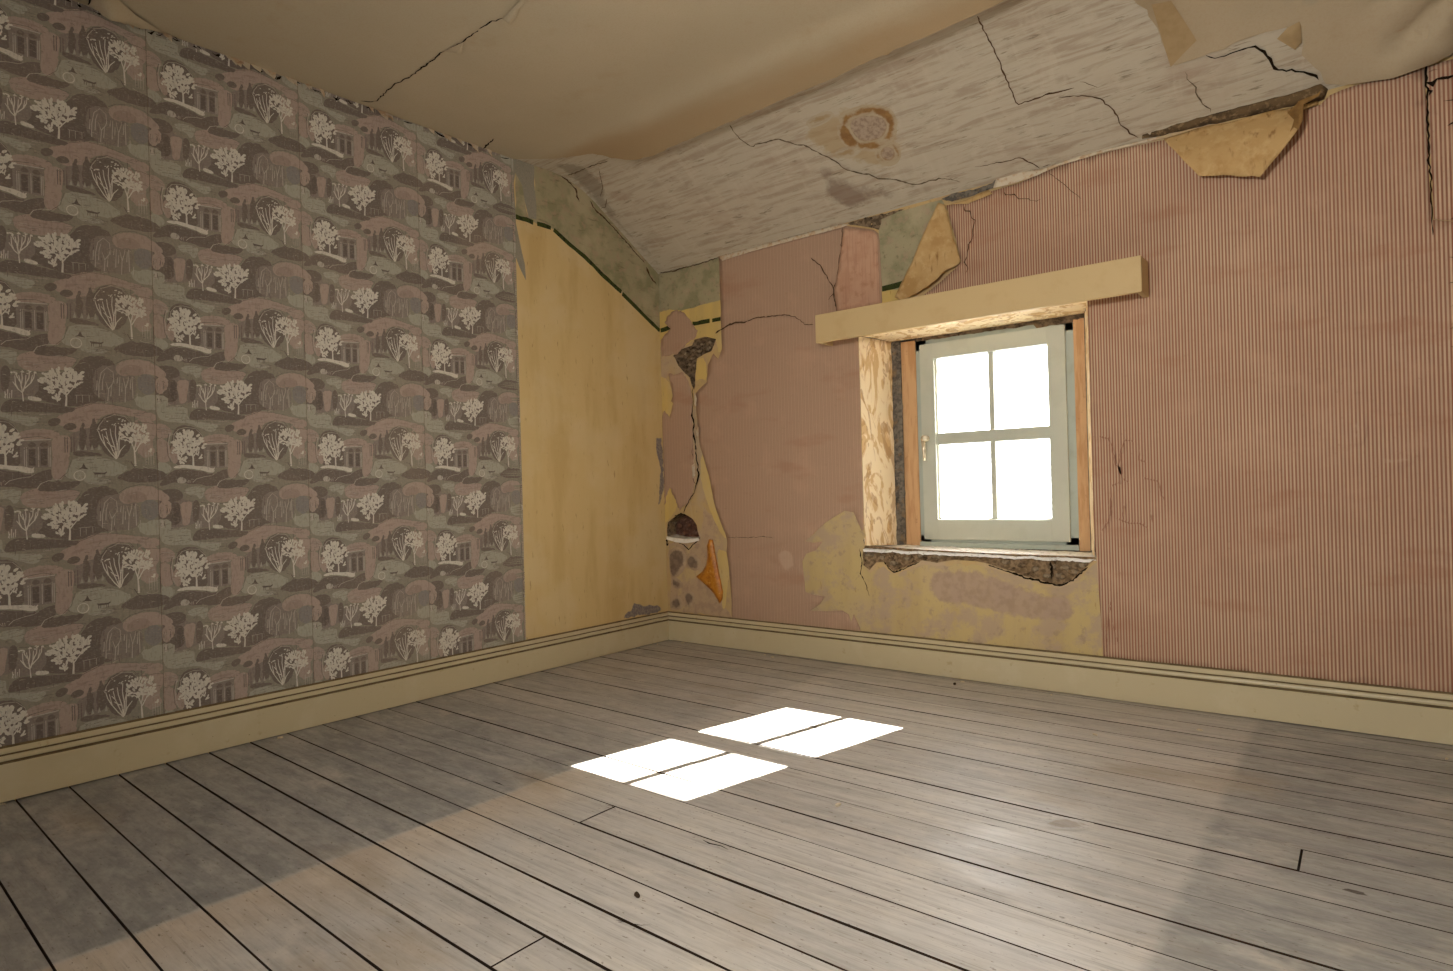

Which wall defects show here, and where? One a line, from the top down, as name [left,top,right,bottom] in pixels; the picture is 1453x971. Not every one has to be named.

crack [364,0,528,102]
crack [977,16,1138,138]
crack [1185,45,1319,112]
damp [798,98,907,216]
peeling [1142,84,1328,177]
peeling [834,180,996,311]
spalling [674,337,716,389]
flaking render [623,507,732,619]
spalling [859,545,1096,594]